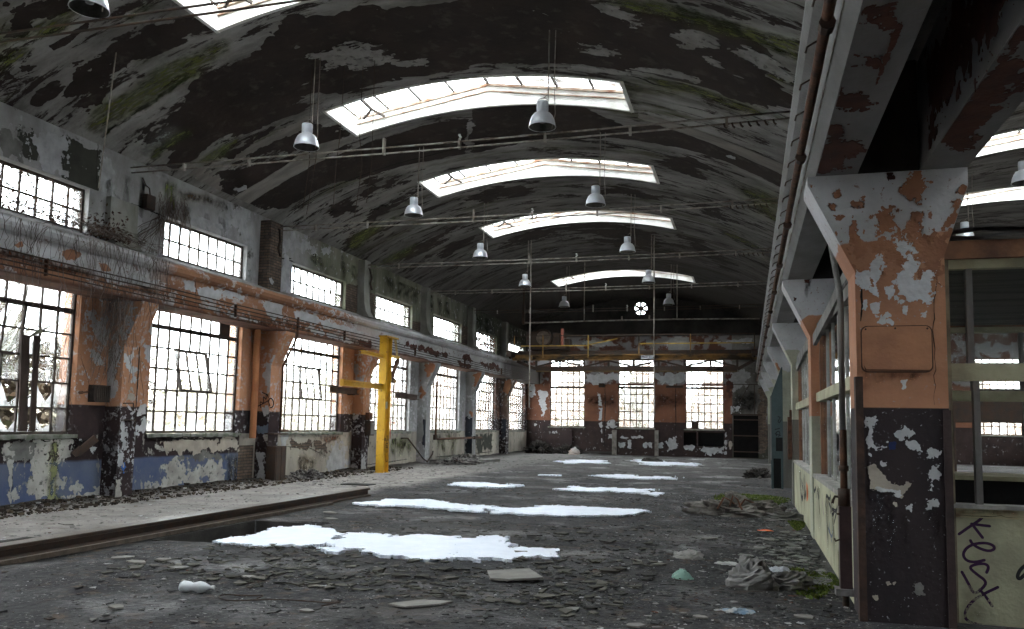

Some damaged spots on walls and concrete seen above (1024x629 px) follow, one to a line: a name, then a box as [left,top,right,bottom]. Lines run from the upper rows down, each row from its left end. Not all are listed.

peeling [30,17,204,114]
peeling [0,124,71,179]
peeling [134,0,793,348]
peeling [818,87,879,174]
peeling [810,170,967,326]
peeling [3,439,100,504]
peeling [84,310,152,497]
peeling [144,436,240,489]
peeling [256,355,366,479]
peeling [530,384,549,426]
peeling [585,372,733,480]
peeling [864,416,942,513]